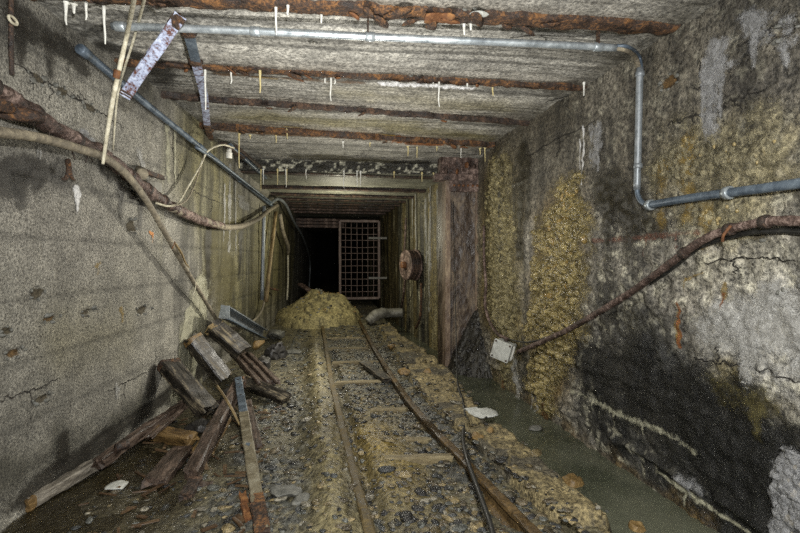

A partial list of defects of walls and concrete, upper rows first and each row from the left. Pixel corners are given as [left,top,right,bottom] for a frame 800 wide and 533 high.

corrosion [348,6,461,30]
corrosion [469,12,483,27]
corrosion [213,67,268,78]
damp [700,36,733,140]
crack [706,256,795,275]
crack [694,346,799,383]
crack [0,378,62,408]
damp [574,276,800,533]